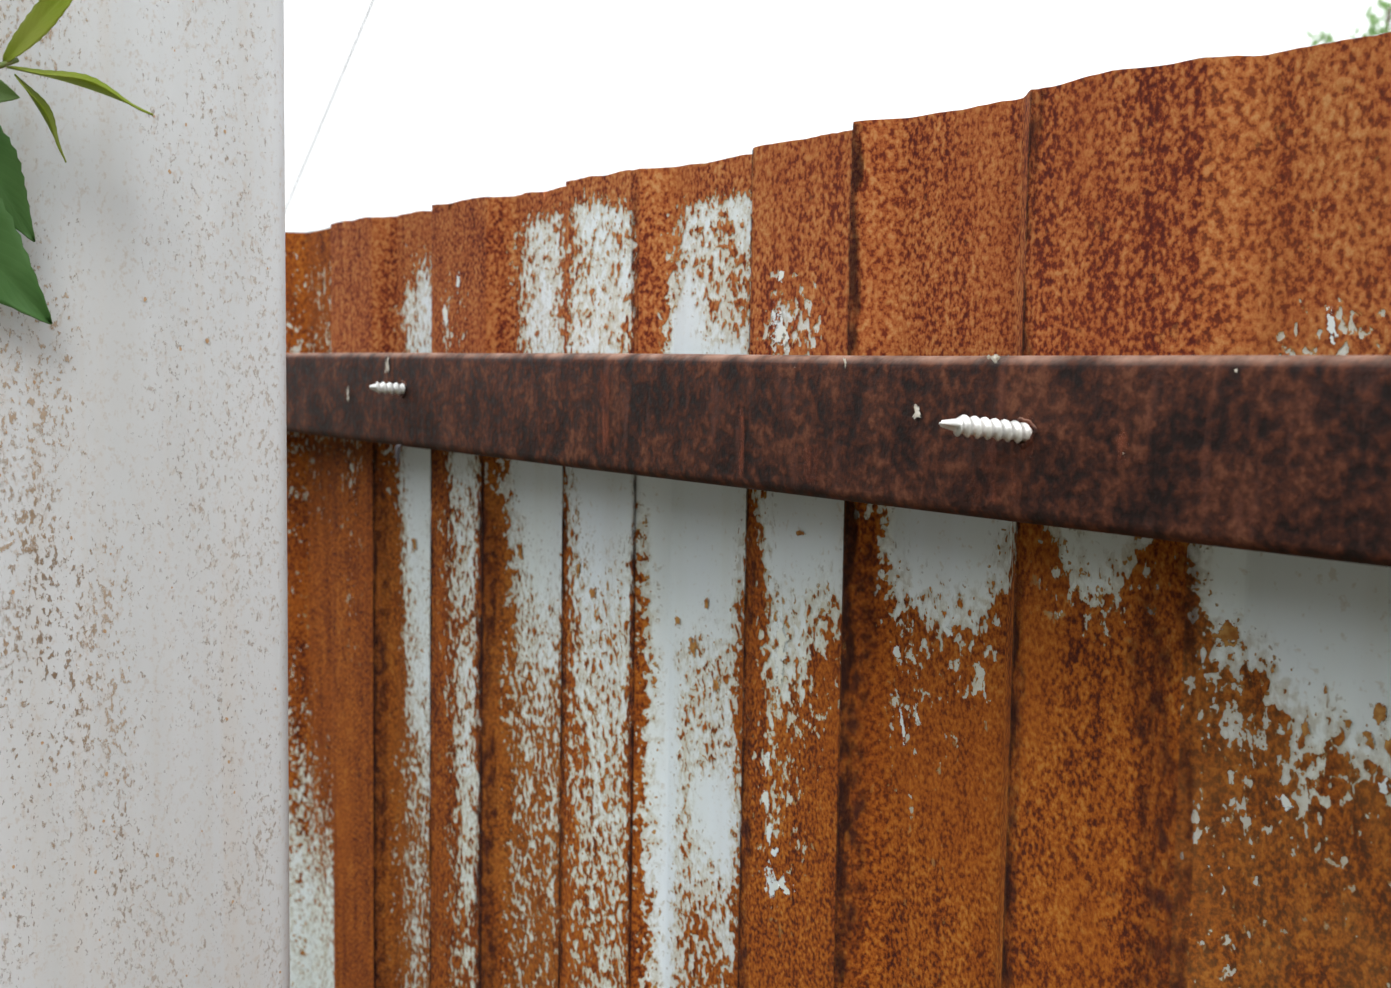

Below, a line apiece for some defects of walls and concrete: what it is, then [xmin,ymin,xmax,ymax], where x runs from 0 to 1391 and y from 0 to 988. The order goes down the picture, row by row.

corrosion [267,32,1391,356]
corrosion [275,432,1391,988]